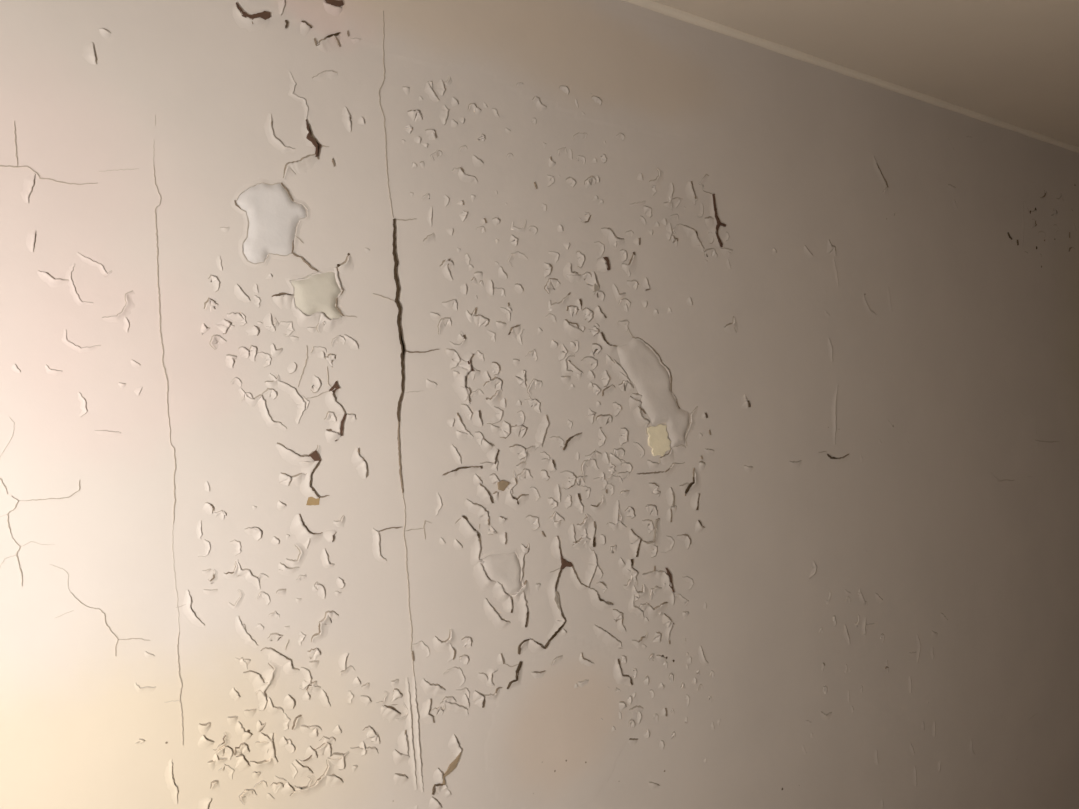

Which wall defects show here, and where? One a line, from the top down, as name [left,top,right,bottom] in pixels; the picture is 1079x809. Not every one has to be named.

peeling [232,0,361,52]
crack [0,116,186,804]
crack [238,348,368,568]
crack [263,11,439,809]
peeling [182,590,205,628]
peeling [196,481,380,809]
peeling [338,629,498,786]